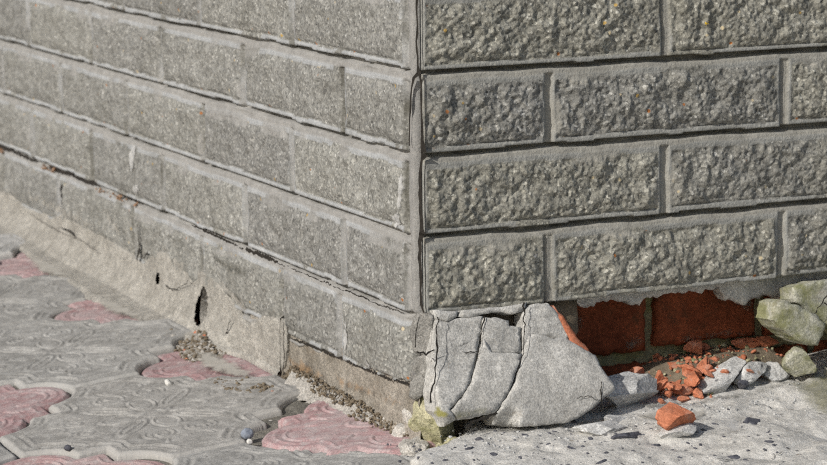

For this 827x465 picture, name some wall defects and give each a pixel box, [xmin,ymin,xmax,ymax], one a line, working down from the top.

crack [409,0,615,428]
spalling [576,289,827,376]